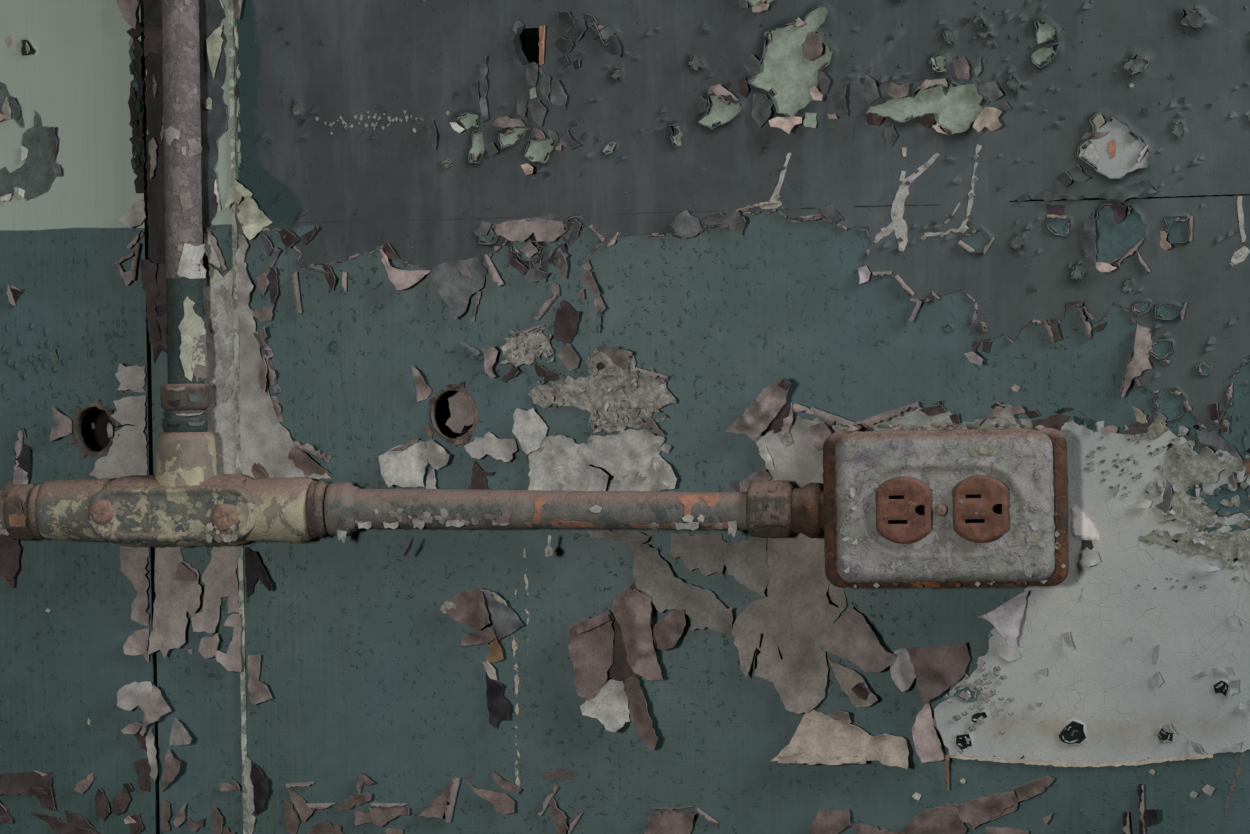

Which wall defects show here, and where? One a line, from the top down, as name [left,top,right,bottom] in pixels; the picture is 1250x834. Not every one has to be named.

peeling [7,35,39,58]
peeling [0,82,64,202]
flaking render [89,0,677,513]
peeling [645,194,941,322]
peeling [665,0,1012,154]
peeling [1024,13,1067,74]
peeling [1010,108,1250,274]
peeling [113,495,273,705]
peeling [439,588,524,729]
flaking render [568,293,1250,834]
peeling [0,681,269,834]
peeling [284,770,521,834]